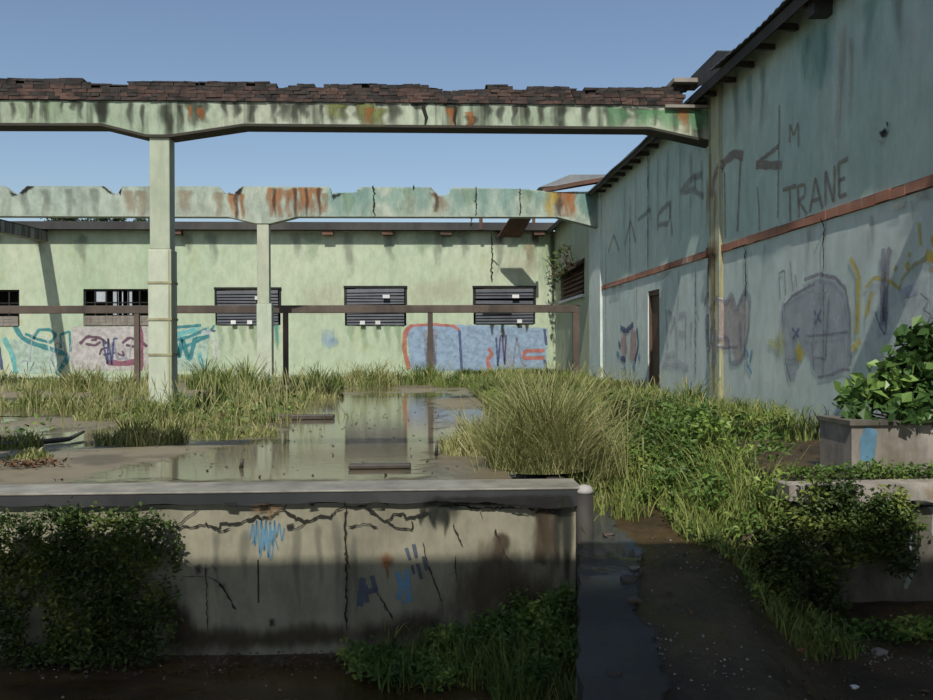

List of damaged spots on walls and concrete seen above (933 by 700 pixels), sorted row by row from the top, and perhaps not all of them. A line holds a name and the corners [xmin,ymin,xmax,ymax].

leakage [94,102,107,122]
leakage [161,105,172,128]
leakage [178,102,208,121]
leakage [221,102,256,118]
rust [229,192,244,217]
rust [267,187,328,213]
crack [489,234,497,282]
leakage [419,499,457,528]
leakage [535,496,573,575]
crack [172,500,555,631]
leakage [456,533,547,621]